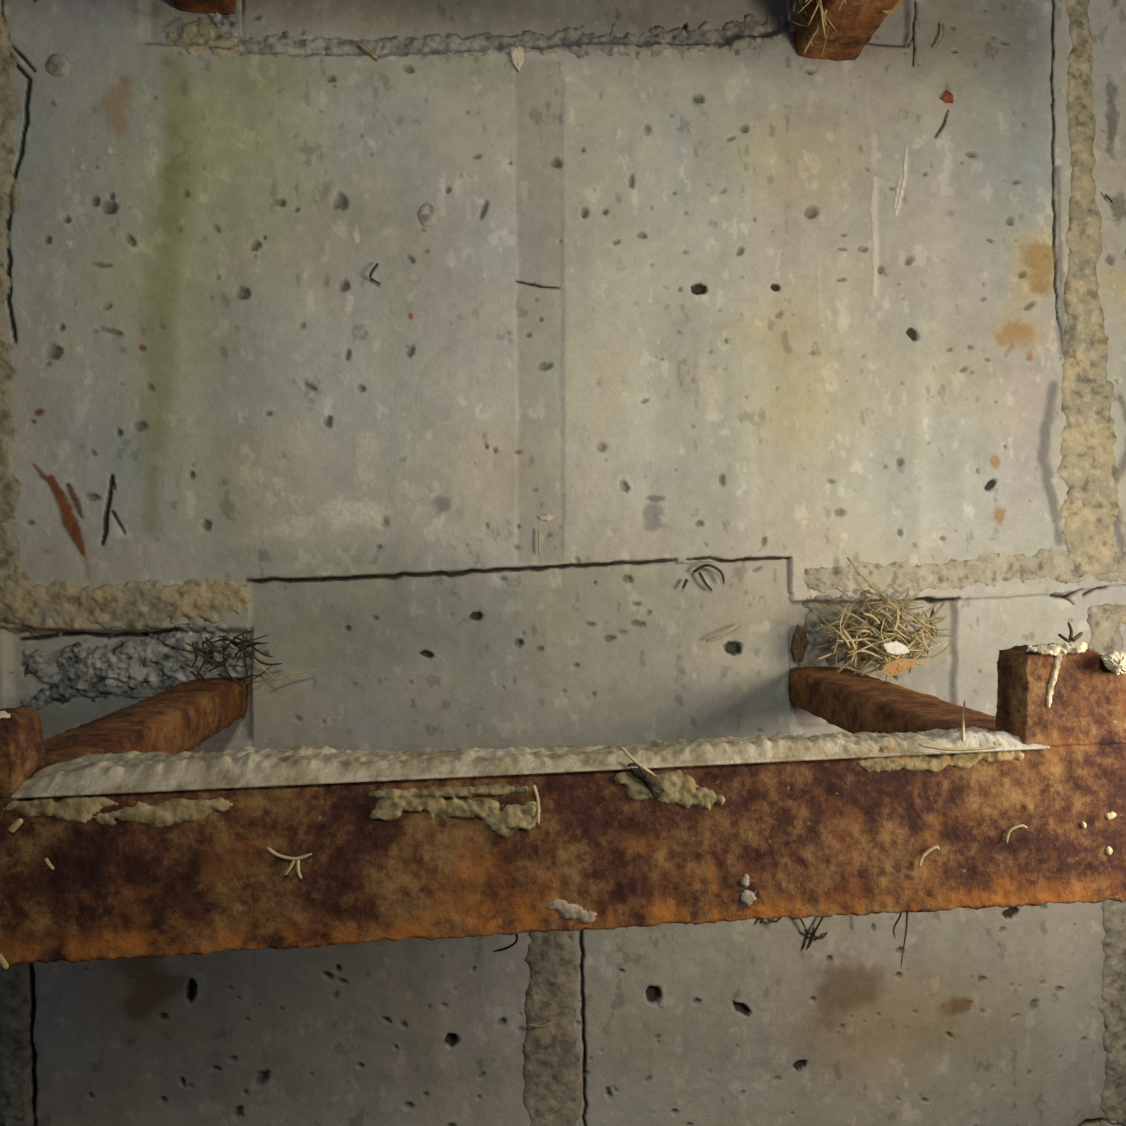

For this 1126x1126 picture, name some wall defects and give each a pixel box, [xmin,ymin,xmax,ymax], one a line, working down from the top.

crack [1050,0,1062,338]
crack [248,556,789,583]
crack [579,930,587,1126]